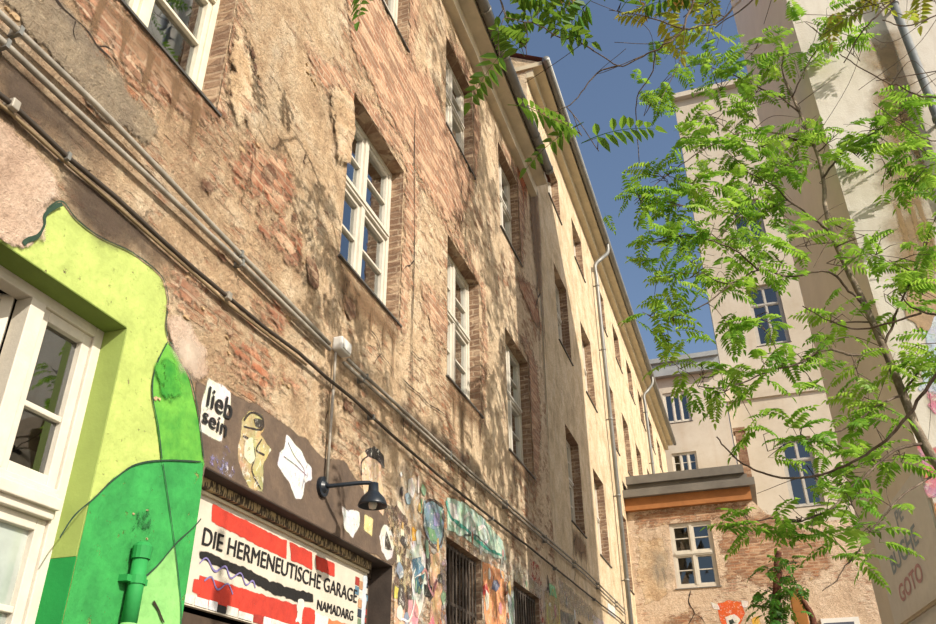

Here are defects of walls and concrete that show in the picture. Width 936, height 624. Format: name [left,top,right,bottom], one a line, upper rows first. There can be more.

peeling [4,0,251,144]
peeling [0,121,59,248]
flaking render [200,176,217,194]
flaking render [230,129,319,291]
peeling [154,269,214,402]